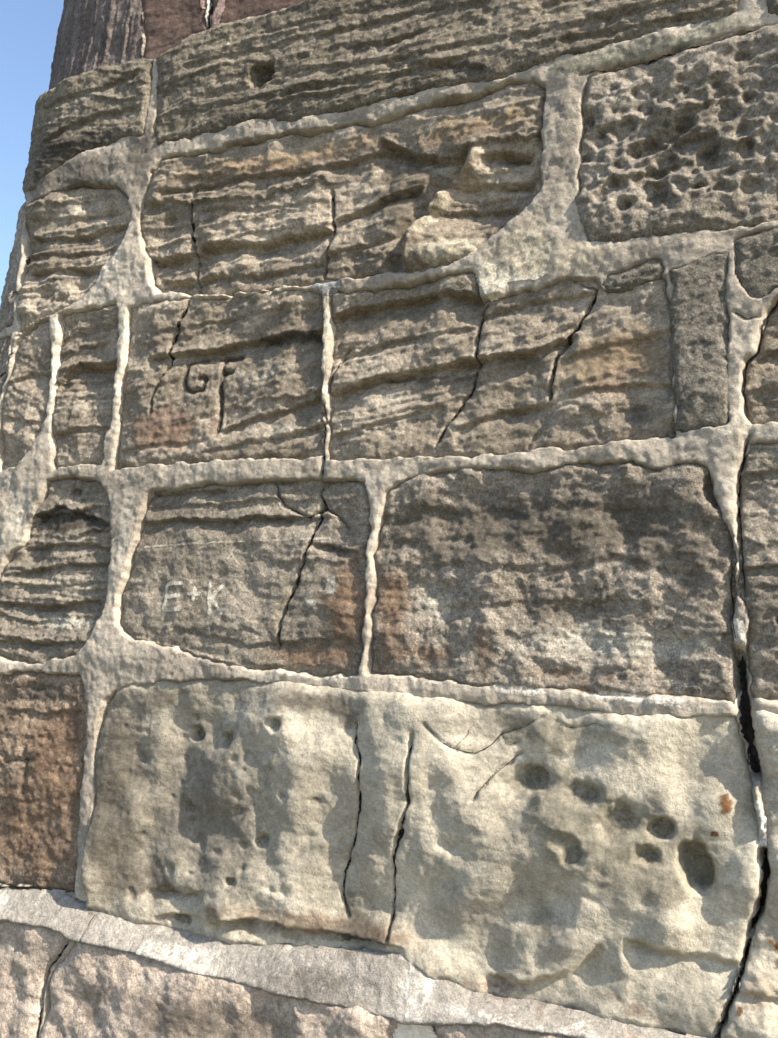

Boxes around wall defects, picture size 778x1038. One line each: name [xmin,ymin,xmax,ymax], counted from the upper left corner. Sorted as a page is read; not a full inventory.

crack [206,0,214,29]
crack [191,200,200,282]
crack [152,305,190,406]
crack [440,310,486,439]
crack [551,286,598,398]
crack [277,404,345,644]
crack [730,437,760,773]
crack [343,723,362,913]
crack [388,717,608,936]
crack [722,848,770,1024]